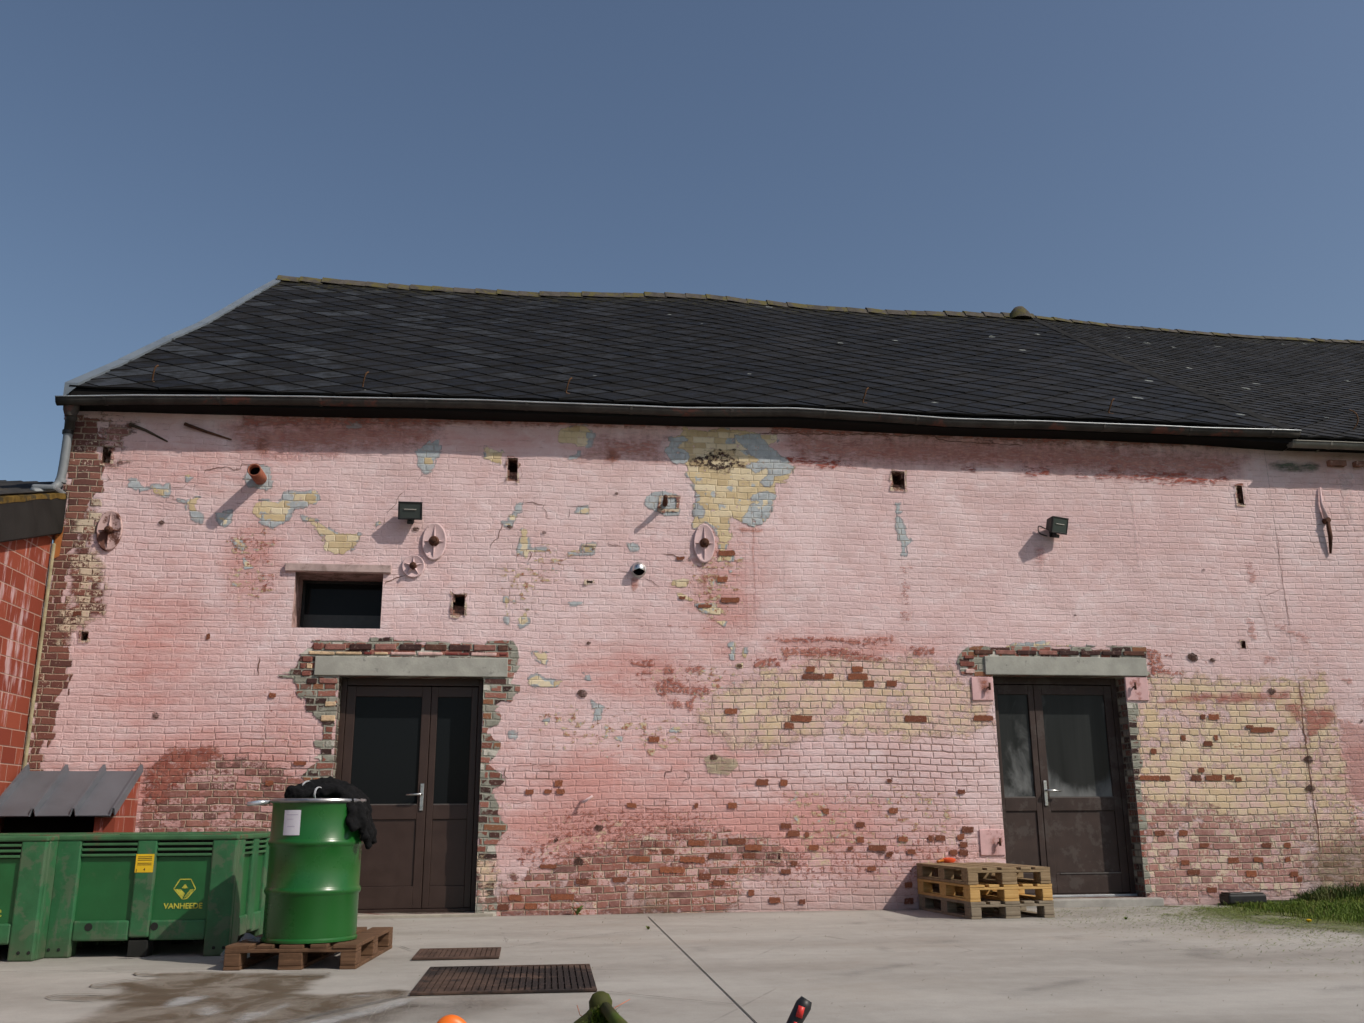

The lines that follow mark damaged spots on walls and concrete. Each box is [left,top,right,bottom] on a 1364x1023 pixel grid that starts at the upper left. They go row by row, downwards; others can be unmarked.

peeling [483,447,520,483]
peeling [558,423,596,460]
flaking render [23,412,381,771]
peeling [497,502,597,629]
peeling [644,426,796,647]
peeling [890,469,913,621]
flaking render [527,635,996,760]
flaking render [1129,646,1364,904]
flaking render [496,779,974,916]